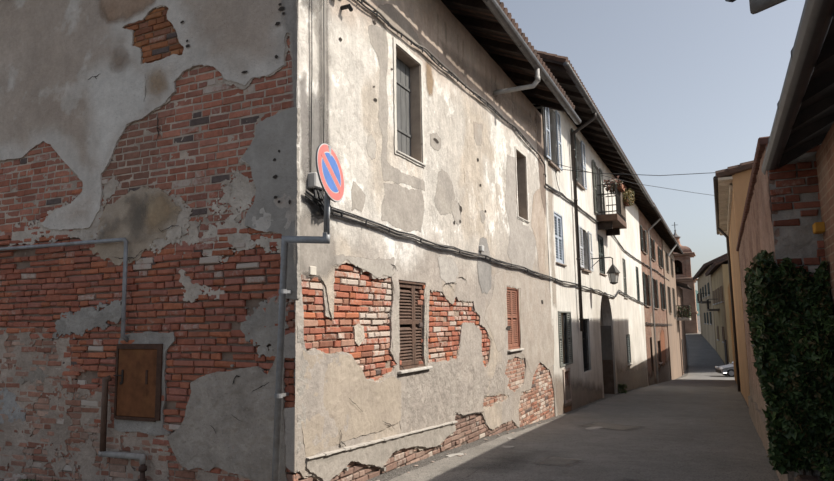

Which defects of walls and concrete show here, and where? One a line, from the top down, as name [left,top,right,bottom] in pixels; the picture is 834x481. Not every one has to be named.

spalling [124,7,190,63]
spalling [0,36,402,481]
peeling [422,133,441,151]
peeling [331,154,555,481]